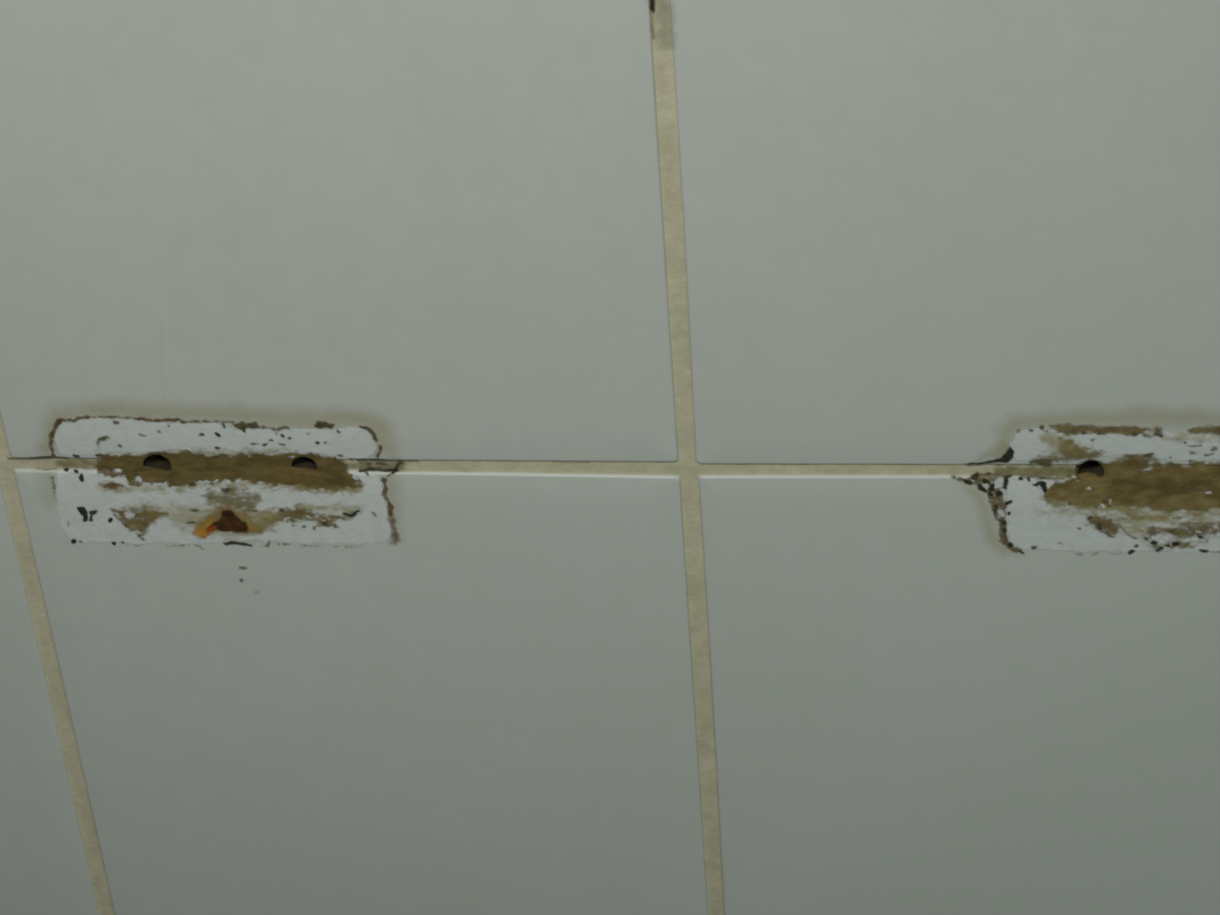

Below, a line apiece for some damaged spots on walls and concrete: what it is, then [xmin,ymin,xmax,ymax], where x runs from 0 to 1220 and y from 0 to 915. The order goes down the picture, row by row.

peeling [54,417,392,545]
corrosion [194,505,263,538]
peeling [956,426,1220,554]